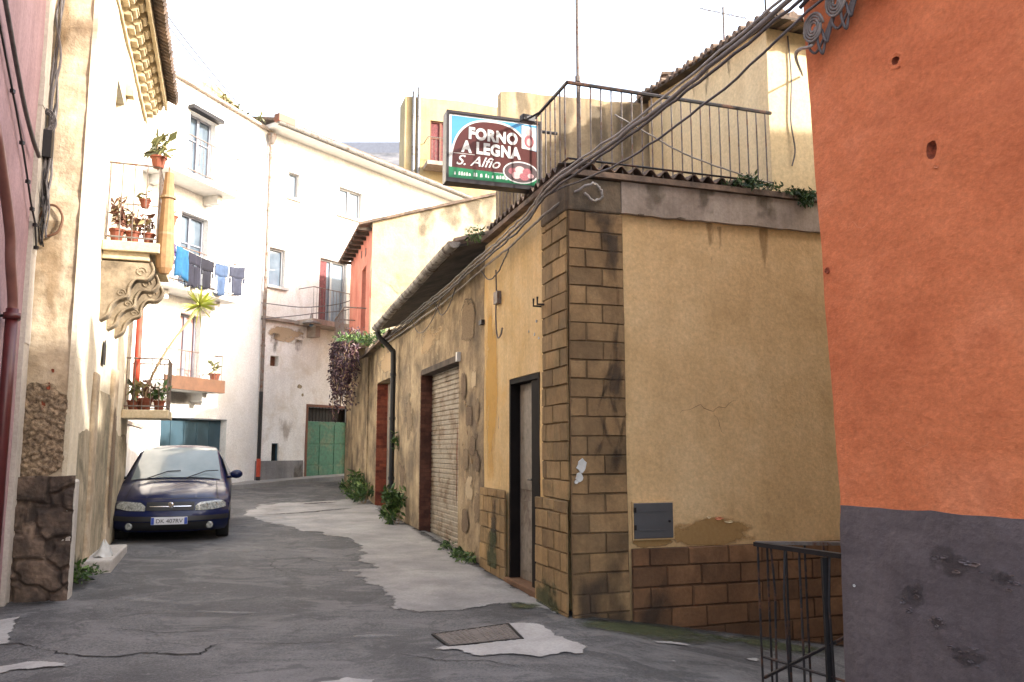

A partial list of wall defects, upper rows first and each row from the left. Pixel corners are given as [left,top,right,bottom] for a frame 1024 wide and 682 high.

flaking render [269,327,303,349]
damp [633,516,750,548]